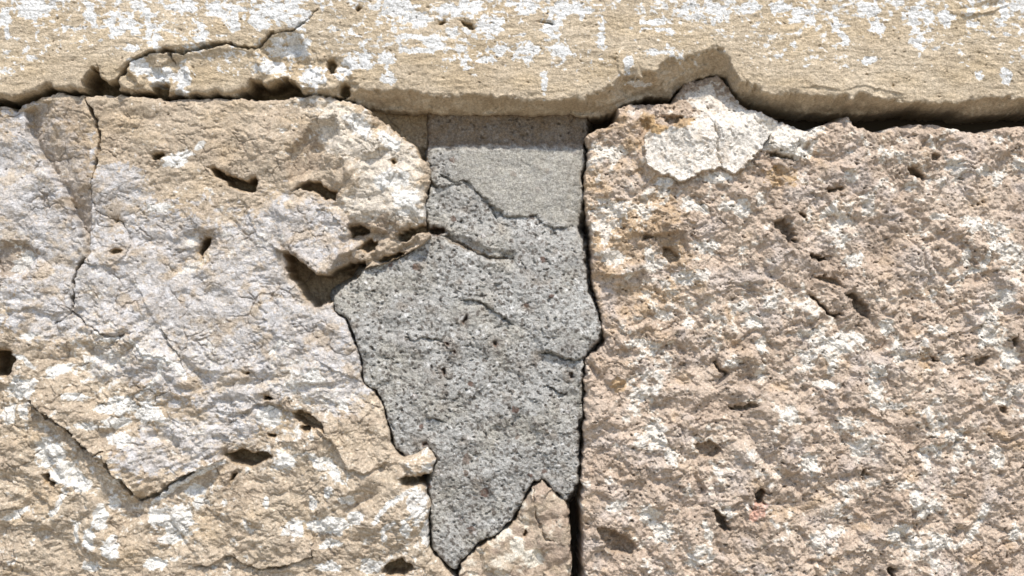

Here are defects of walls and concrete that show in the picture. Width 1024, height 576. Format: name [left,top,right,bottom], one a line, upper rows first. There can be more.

crack [117,9,319,82]
crack [24,97,133,339]
crack [430,166,574,231]
spalling [438,339,459,379]
spalling [458,313,470,327]
spalling [491,339,503,350]
spalling [566,369,577,383]
crack [27,400,196,503]